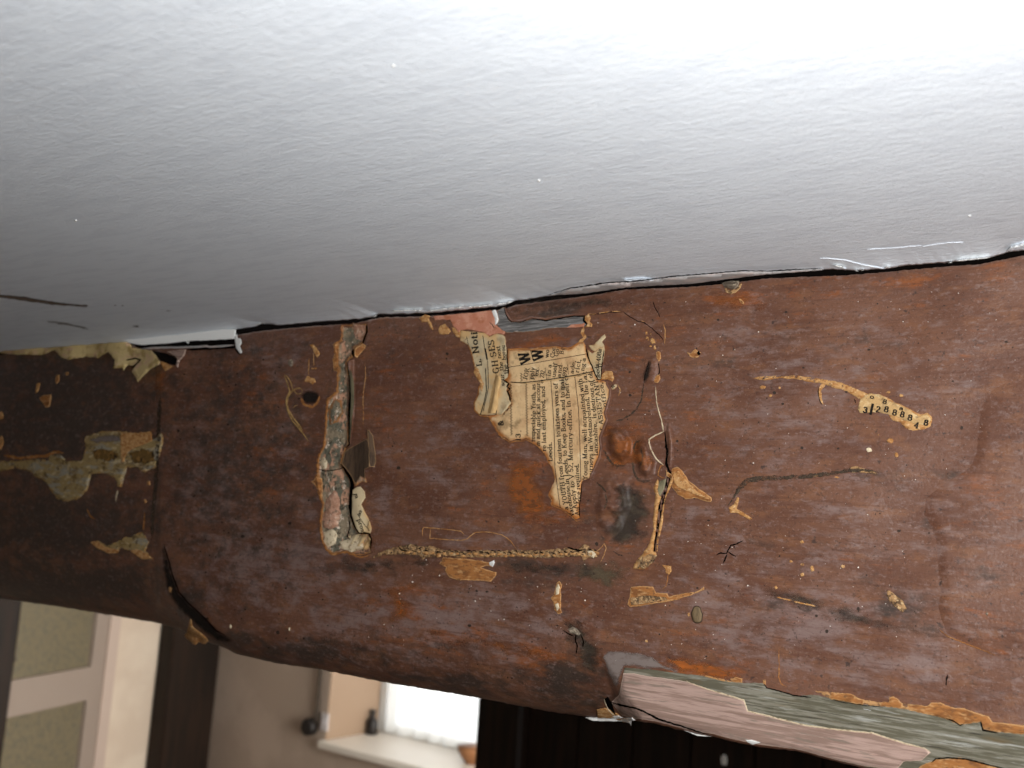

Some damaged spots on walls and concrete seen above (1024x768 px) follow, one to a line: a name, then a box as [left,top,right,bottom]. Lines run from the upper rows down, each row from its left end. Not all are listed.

peeling [347,344,366,444]
peeling [92,432,155,464]
peeling [584,380,612,481]
corrosion [605,426,651,465]
spalling [671,440,712,502]
crack [728,469,874,505]
peeling [91,532,153,559]
peeling [402,521,607,593]
crack [163,546,230,642]
peeling [623,565,704,613]
corrosion [670,660,732,677]
spalling [585,697,634,723]